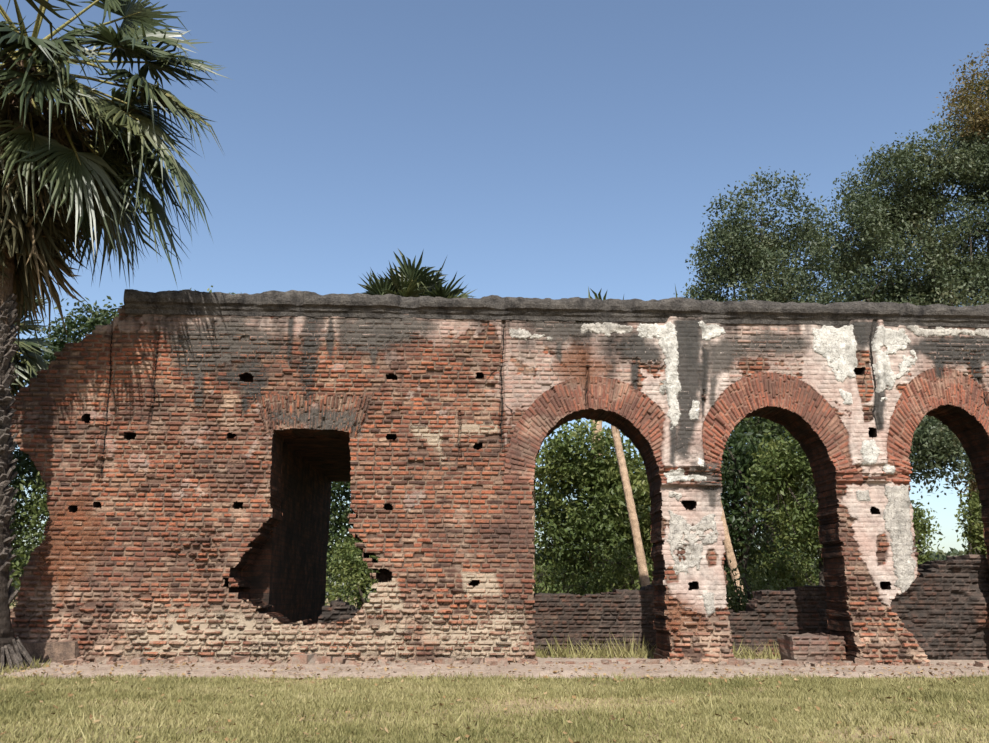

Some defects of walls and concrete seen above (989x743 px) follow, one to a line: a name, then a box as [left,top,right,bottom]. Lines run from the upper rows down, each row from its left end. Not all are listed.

crack [94,322,116,481]
crack [458,320,514,453]
flaking render [581,322,700,430]
flaking render [663,458,719,616]
flaking render [698,321,726,341]
flaking render [812,325,989,593]